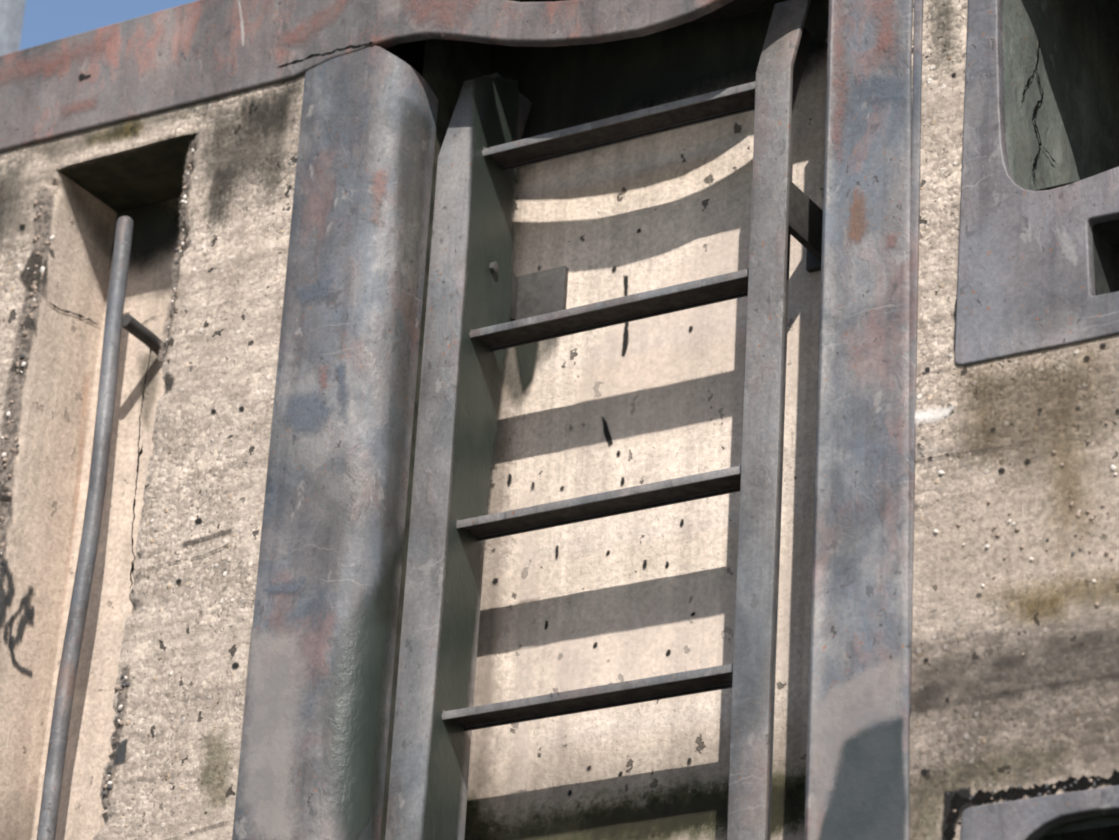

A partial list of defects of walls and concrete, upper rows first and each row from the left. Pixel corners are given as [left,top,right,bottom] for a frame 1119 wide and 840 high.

crack [277,41,374,67]
crack [1021,41,1055,183]
crack [46,300,98,325]
crack [130,316,231,589]